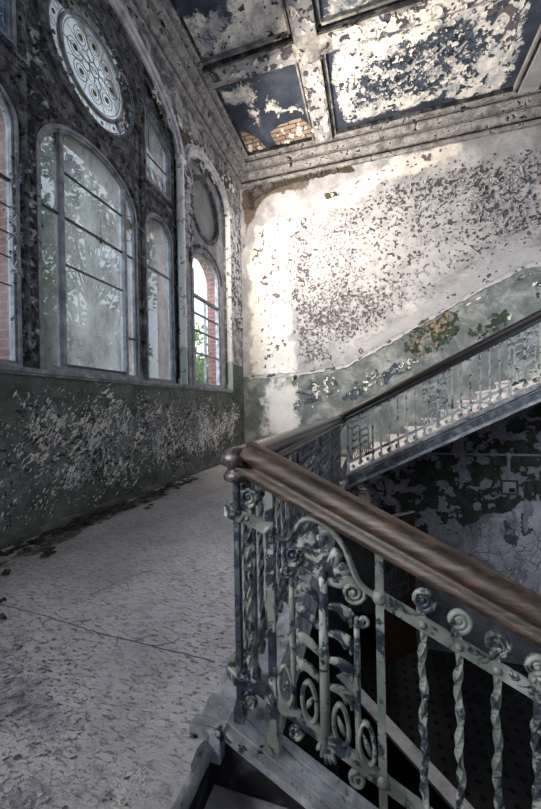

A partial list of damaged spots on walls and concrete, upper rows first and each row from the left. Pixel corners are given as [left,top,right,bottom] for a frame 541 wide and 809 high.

peeling [286,0,315,37]
peeling [328,0,527,53]
flaking render [144,76,234,260]
flaking render [240,131,266,152]
flaking render [211,46,331,145]
peeling [230,149,541,409]
peeling [0,372,239,528]
peeling [345,402,541,547]
crack [0,604,215,662]